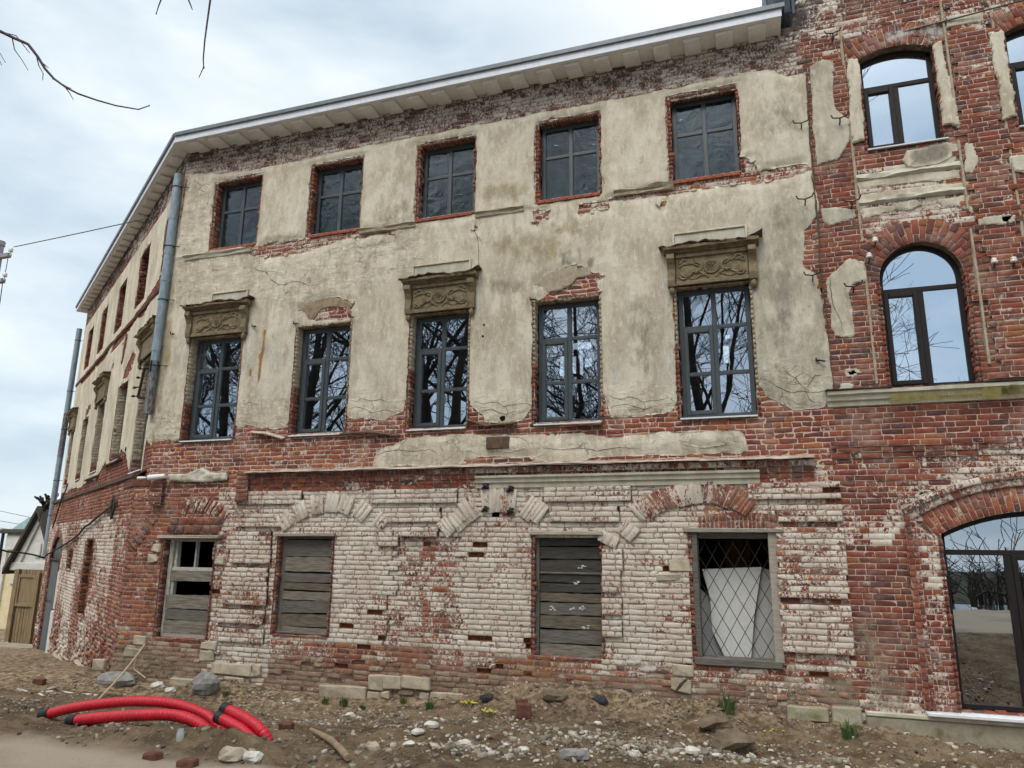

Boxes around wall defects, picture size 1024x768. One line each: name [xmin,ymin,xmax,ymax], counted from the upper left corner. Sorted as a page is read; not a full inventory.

spalling [531,203,551,226]
crack [760,50,844,403]
spalling [993,214,1016,225]
spalling [532,264,605,303]
corrosion [249,330,266,382]
spalling [845,368,862,378]
spalling [461,456,535,469]
spalling [469,542,487,557]
spalling [357,635,386,650]
spalling [477,664,504,674]
spalling [809,671,846,685]